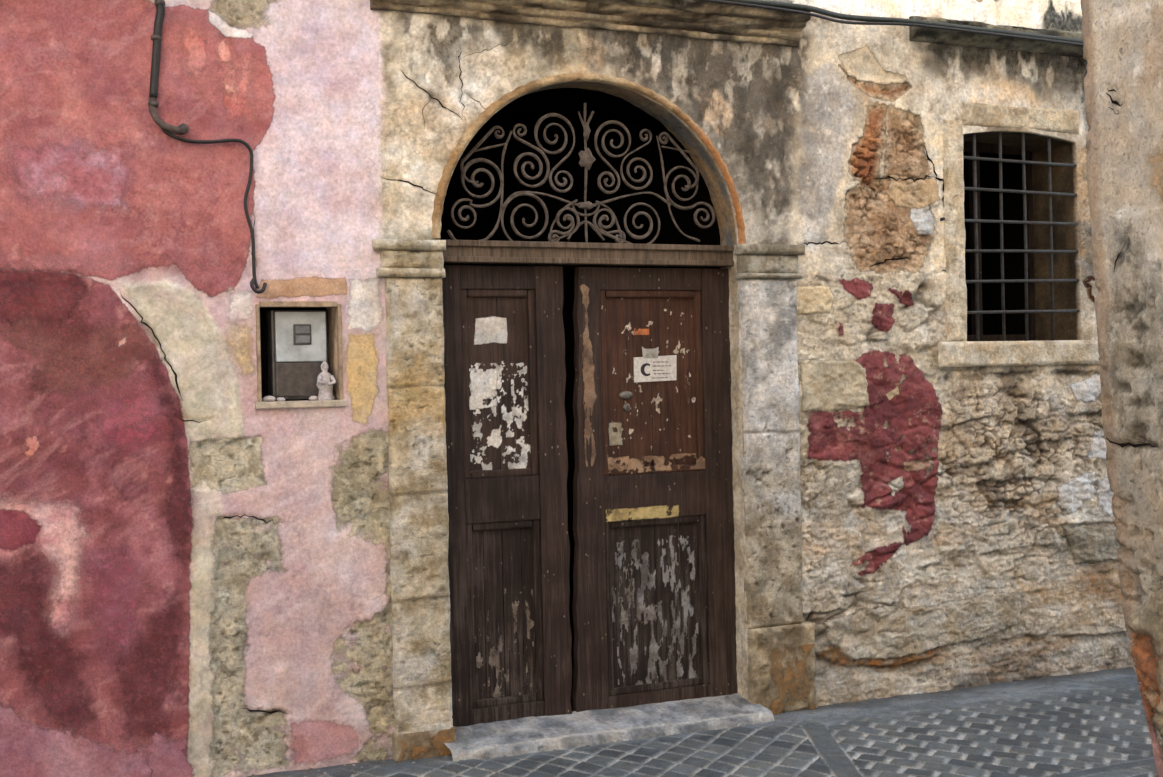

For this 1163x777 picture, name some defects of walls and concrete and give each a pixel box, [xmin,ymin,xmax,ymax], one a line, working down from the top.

water stain [1043,0,1082,33]
crack [400,41,515,122]
water stain [926,43,1088,127]
spalling [838,65,937,332]
crack [1085,242,1126,302]
flaking render [0,0,395,777]
flaking render [807,349,943,576]